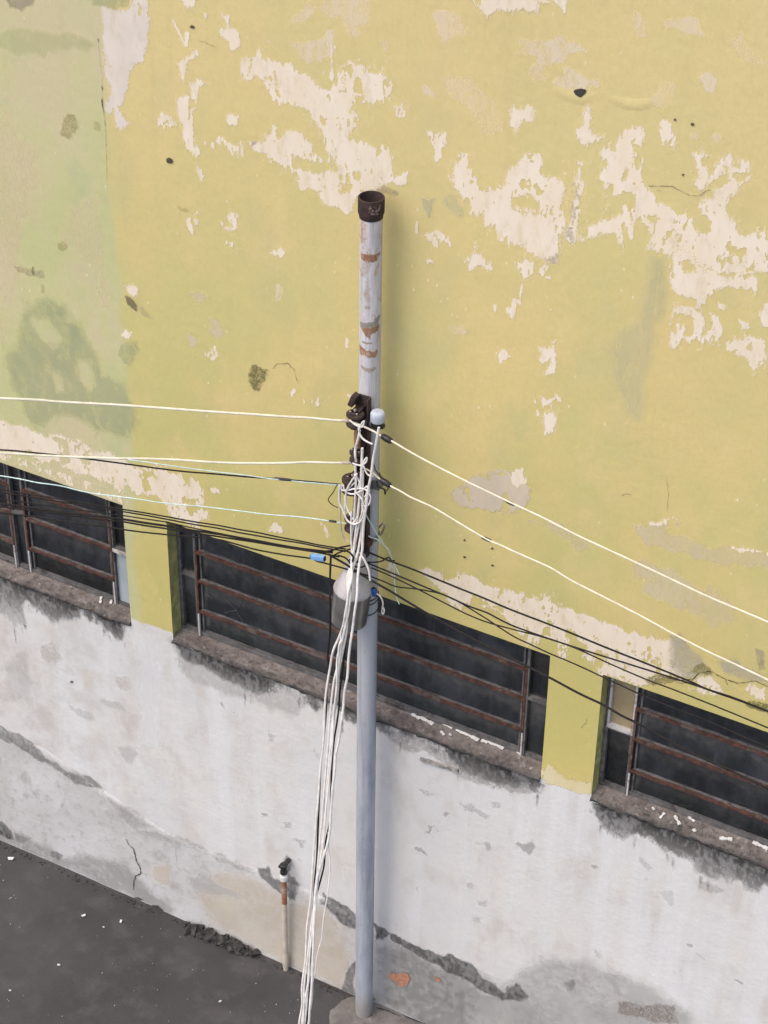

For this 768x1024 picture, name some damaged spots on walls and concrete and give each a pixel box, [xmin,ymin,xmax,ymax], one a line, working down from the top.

peeling [101,0,150,130]
peeling [158,12,410,215]
peeling [427,89,768,377]
peeling [0,420,220,529]
water stain [176,645,283,697]
peeling [417,567,723,695]
water stain [0,726,101,788]
water stain [376,722,544,803]
water stain [0,822,170,912]
crack [126,840,141,890]
water stain [593,803,768,891]
water stain [191,856,356,995]